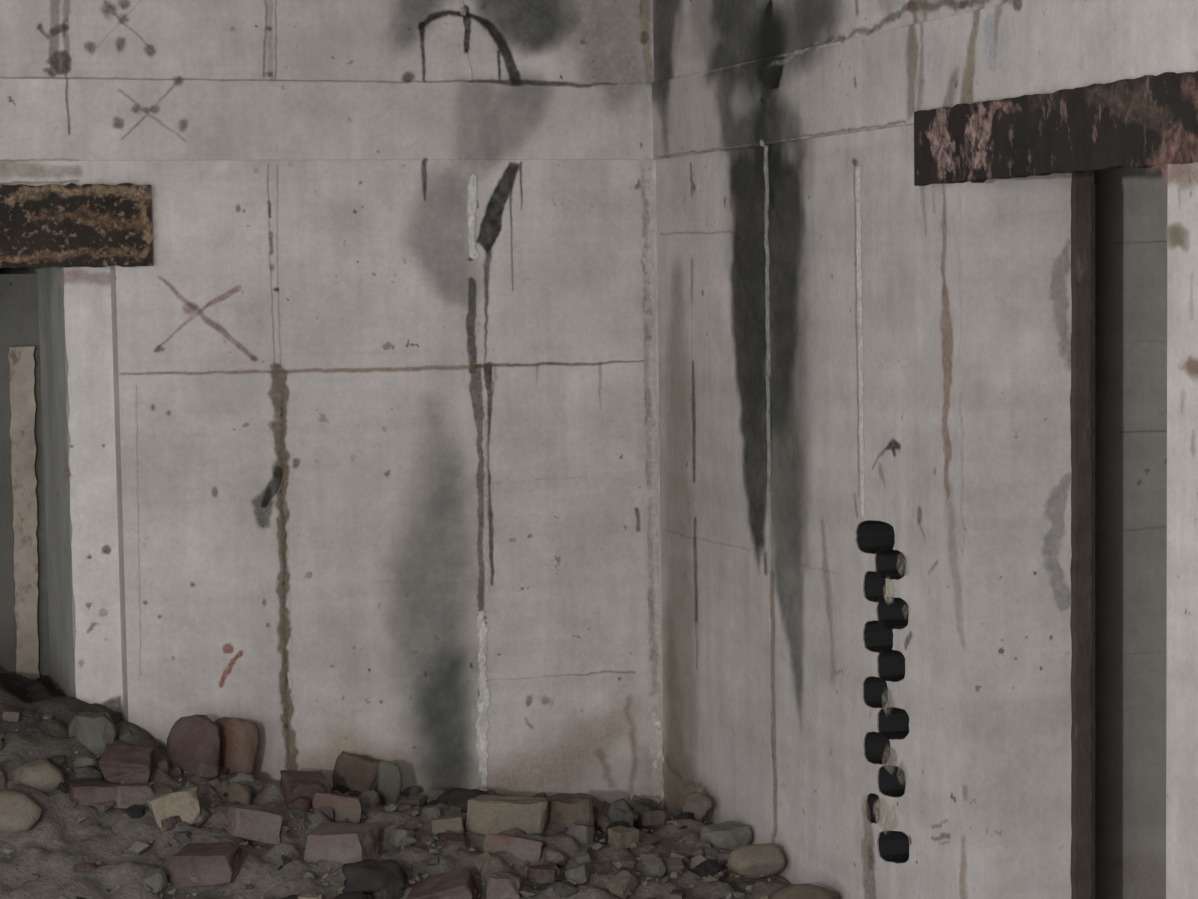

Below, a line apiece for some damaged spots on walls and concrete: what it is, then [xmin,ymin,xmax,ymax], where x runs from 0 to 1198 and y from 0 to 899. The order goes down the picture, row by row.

crack [772,0,980,65]
damp [731,154,800,556]
rust [942,330,951,470]